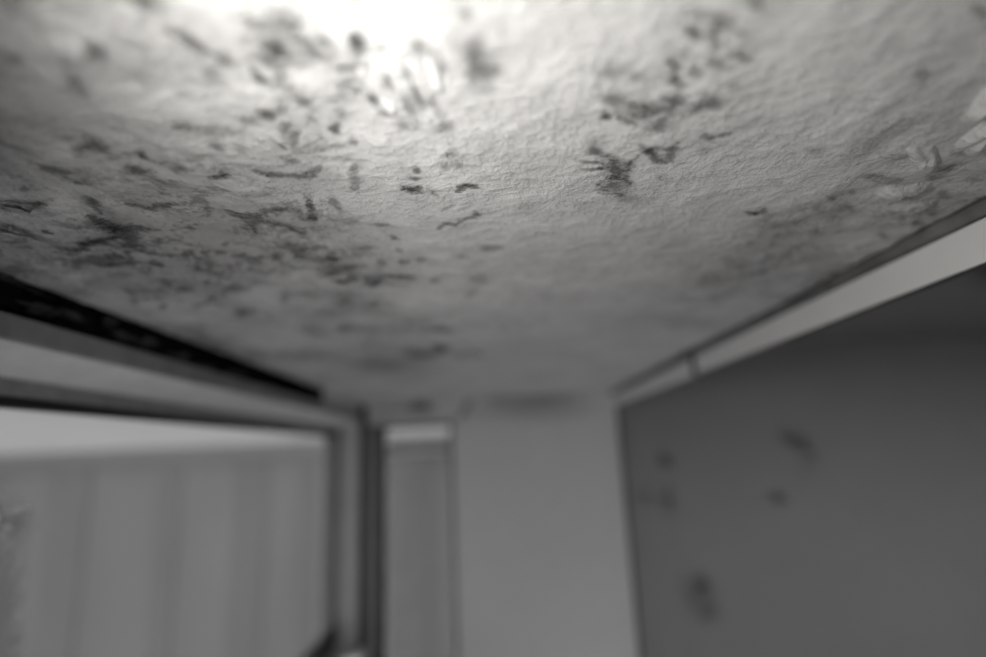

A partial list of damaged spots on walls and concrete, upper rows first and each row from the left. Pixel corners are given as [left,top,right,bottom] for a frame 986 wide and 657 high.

water stain [168,32,203,51]
water stain [336,34,369,72]
water stain [126,152,148,174]
water stain [584,155,631,179]
water stain [400,168,423,194]